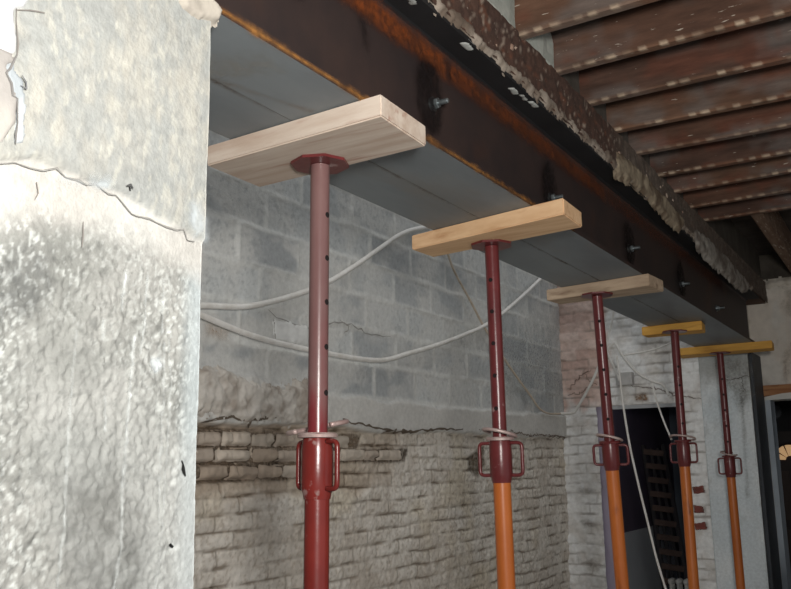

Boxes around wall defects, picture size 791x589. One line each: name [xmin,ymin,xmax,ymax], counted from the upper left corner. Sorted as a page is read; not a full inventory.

peeling [0,0,29,54]
corrosion [222,9,369,100]
crack [0,8,202,242]
corrosion [352,0,604,205]
spalling [196,428,303,484]
spalling [333,434,407,463]